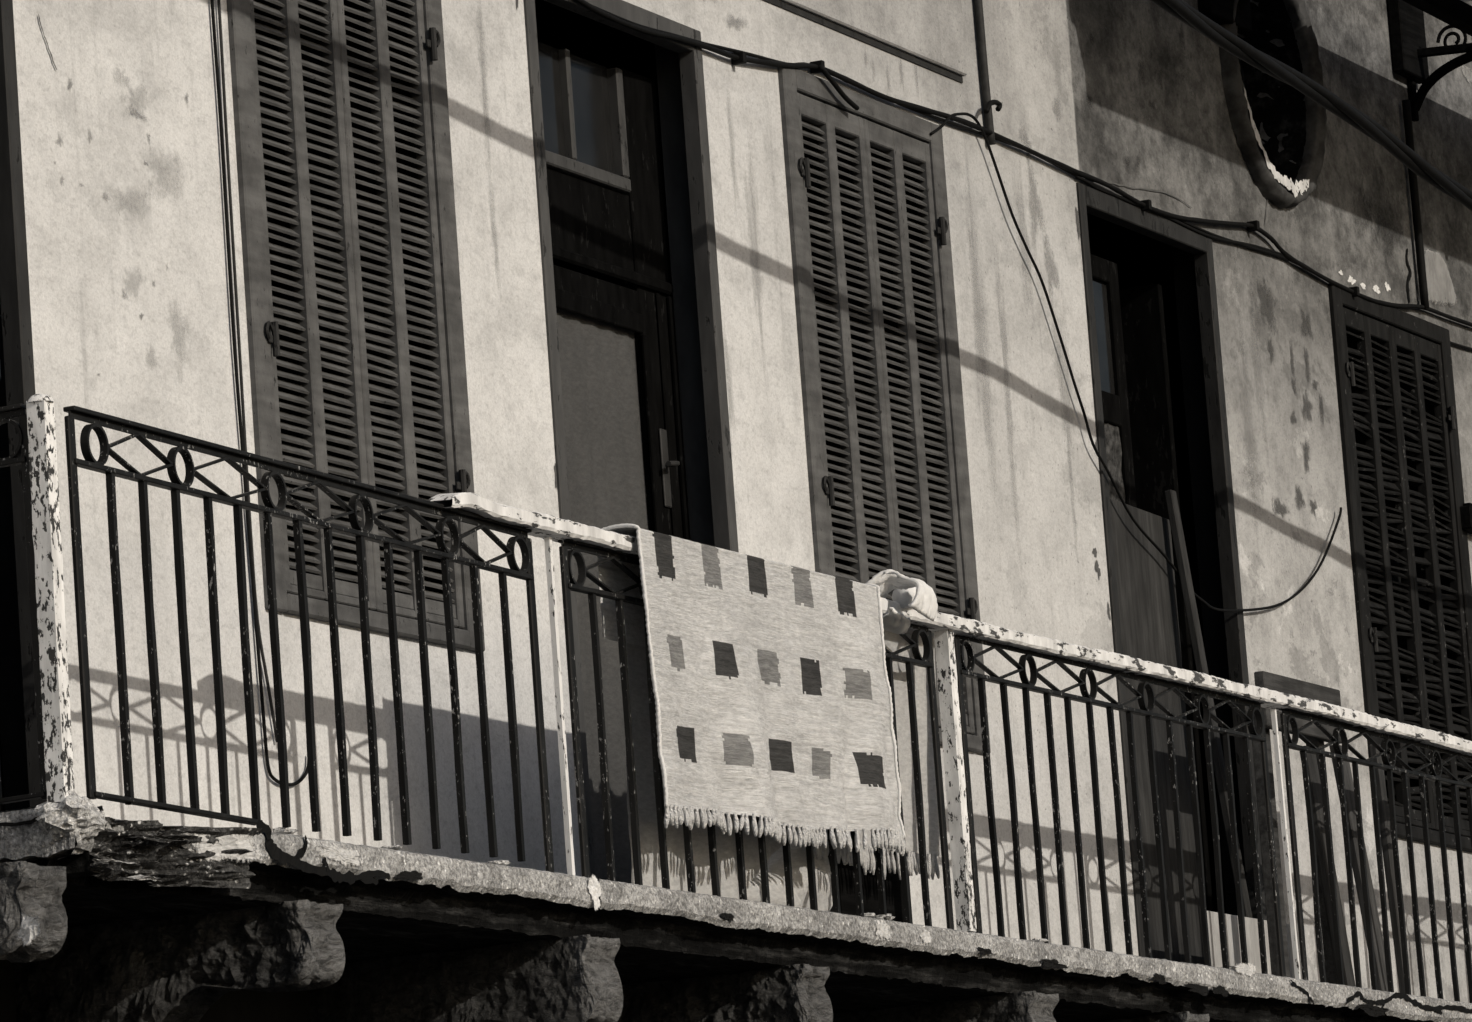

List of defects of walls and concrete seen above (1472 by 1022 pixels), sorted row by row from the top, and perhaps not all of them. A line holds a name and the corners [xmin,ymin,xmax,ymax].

peeling [1244,88,1309,198]
spalling [89,806,262,888]
crack [1290,980,1472,1014]